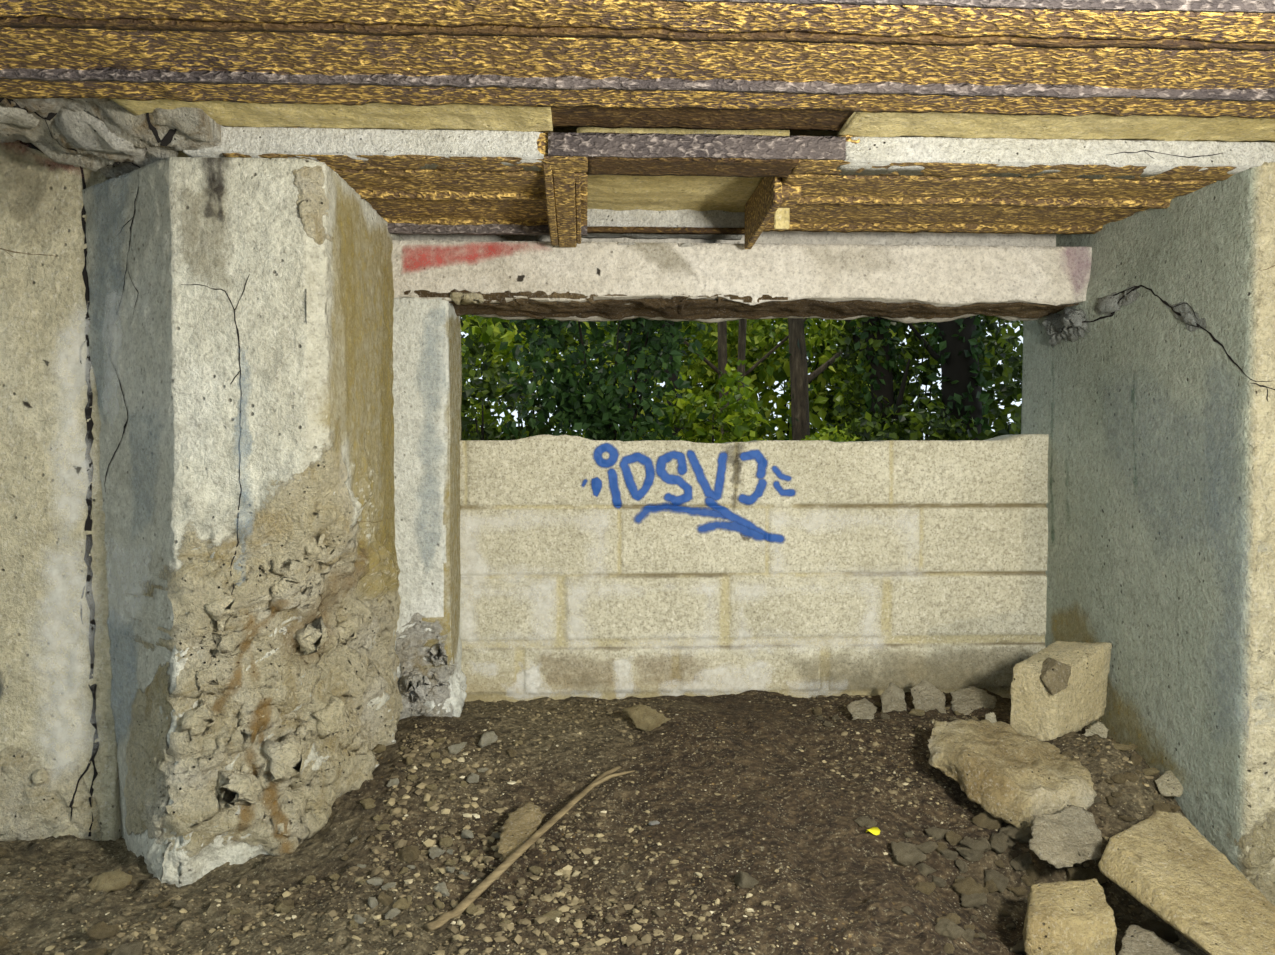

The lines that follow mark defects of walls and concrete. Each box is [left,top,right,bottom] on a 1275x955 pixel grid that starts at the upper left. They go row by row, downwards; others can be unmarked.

spalling [0,98,224,179]
crack [1060,285,1275,401]
crack [0,97,177,837]
crack [181,274,250,595]
spalling [124,417,458,857]
spalling [0,747,102,841]
spalling [1235,808,1275,905]